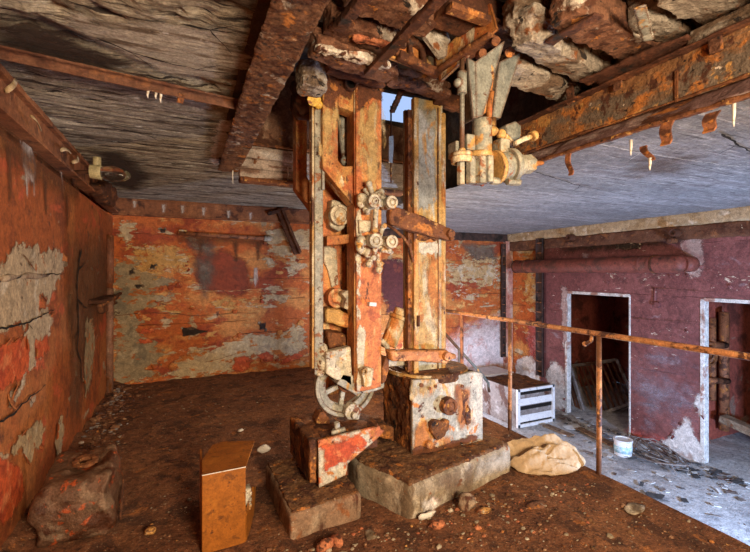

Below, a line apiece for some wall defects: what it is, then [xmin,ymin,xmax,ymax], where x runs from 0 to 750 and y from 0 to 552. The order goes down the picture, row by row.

corrosion [0,127,78,225]
peeling [262,228,309,277]
peeling [0,241,68,410]
crack [0,249,87,383]
peeling [113,244,308,385]
crack [0,385,45,422]
peeling [546,361,566,410]
peeling [0,420,45,465]
peeling [55,414,64,455]
peeling [656,418,704,463]